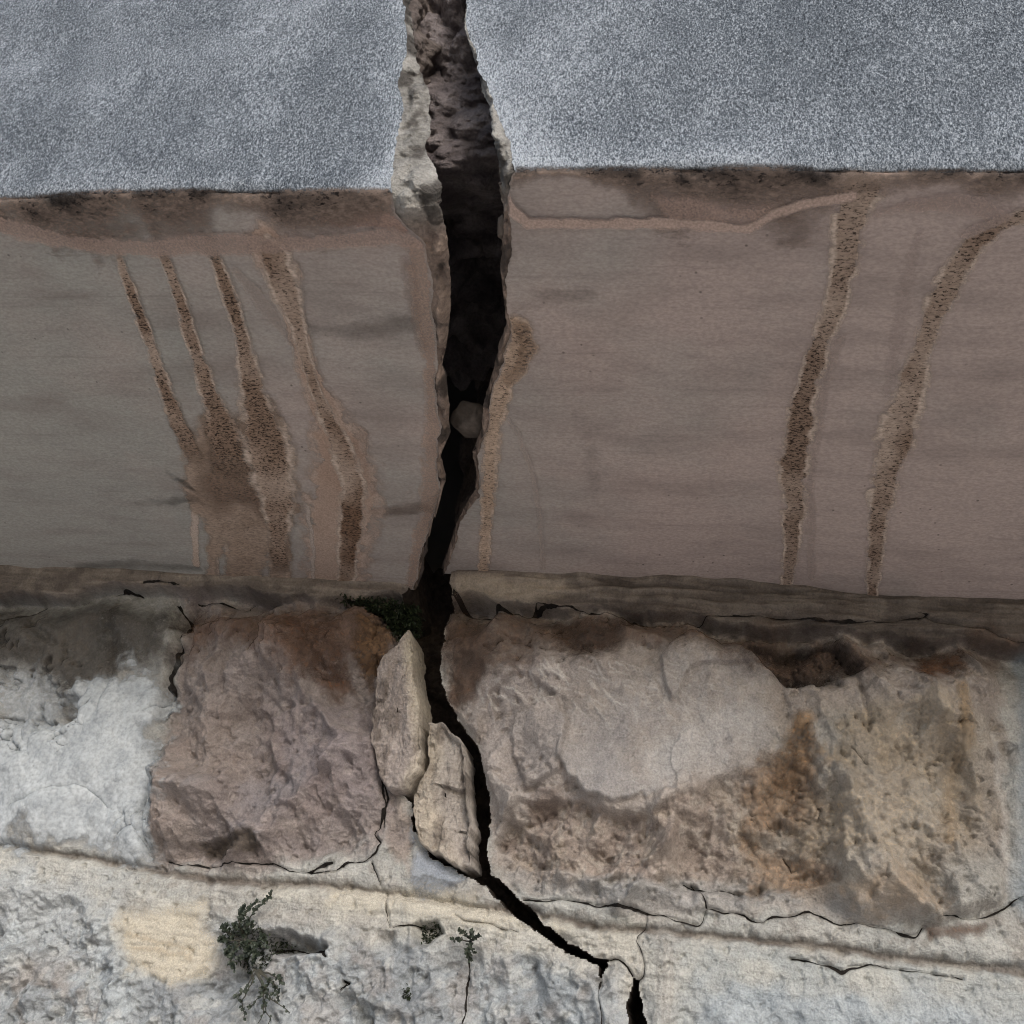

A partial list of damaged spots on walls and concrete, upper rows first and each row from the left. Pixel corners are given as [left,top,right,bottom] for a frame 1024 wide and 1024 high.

damp [0,188,440,589]
crack [406,0,507,391]
damp [508,164,1024,596]
crack [168,557,1024,1024]